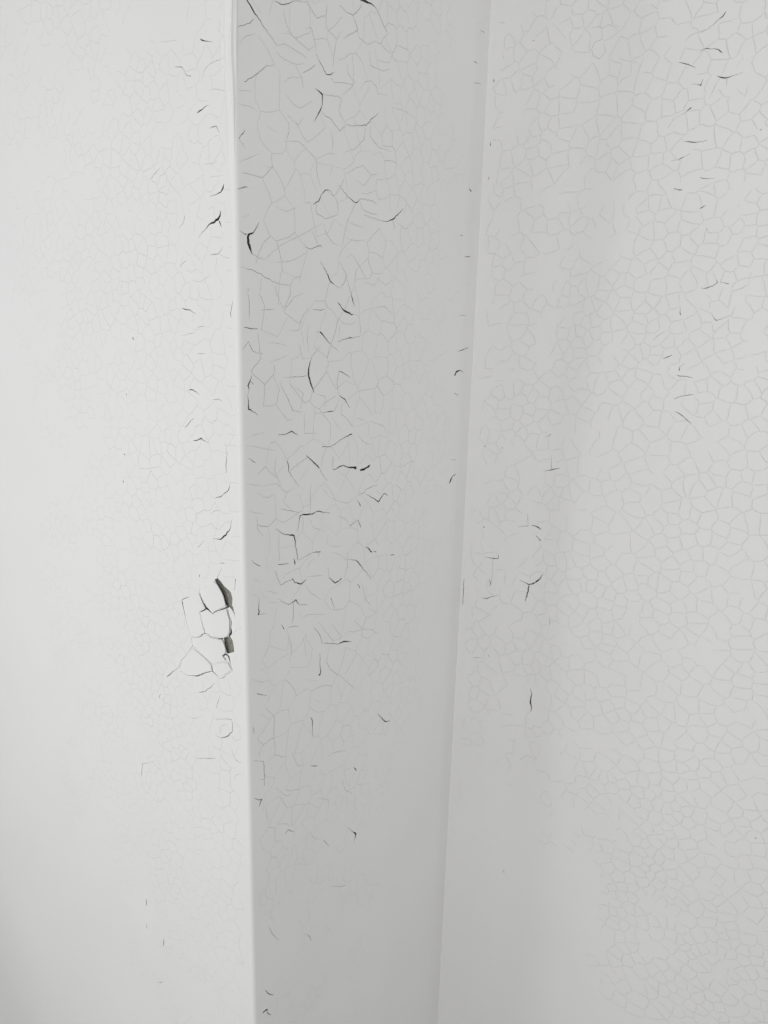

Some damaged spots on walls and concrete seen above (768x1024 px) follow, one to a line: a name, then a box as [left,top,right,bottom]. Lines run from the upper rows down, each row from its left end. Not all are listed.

peeling [179,581,236,679]
crack [176,0,768,1024]